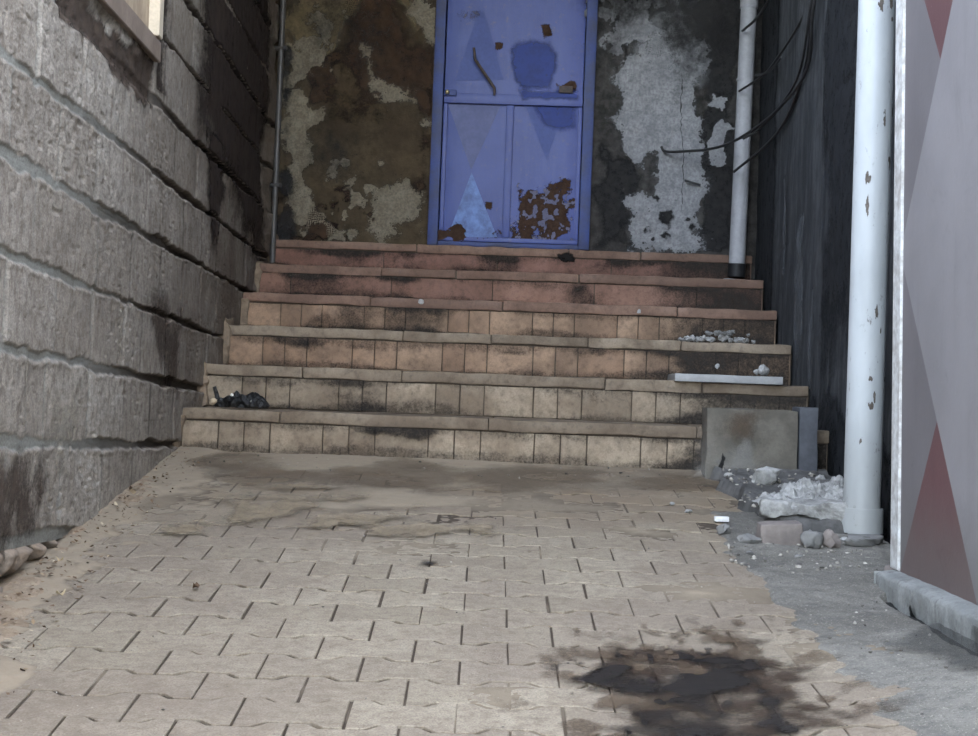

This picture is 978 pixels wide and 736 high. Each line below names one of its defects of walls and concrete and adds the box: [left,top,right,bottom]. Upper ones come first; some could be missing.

peeling [398,0,436,50]
peeling [277,0,427,243]
peeling [584,0,713,254]
corrosion [438,177,580,242]
water stain [147,293,182,387]
water stain [573,655,800,736]